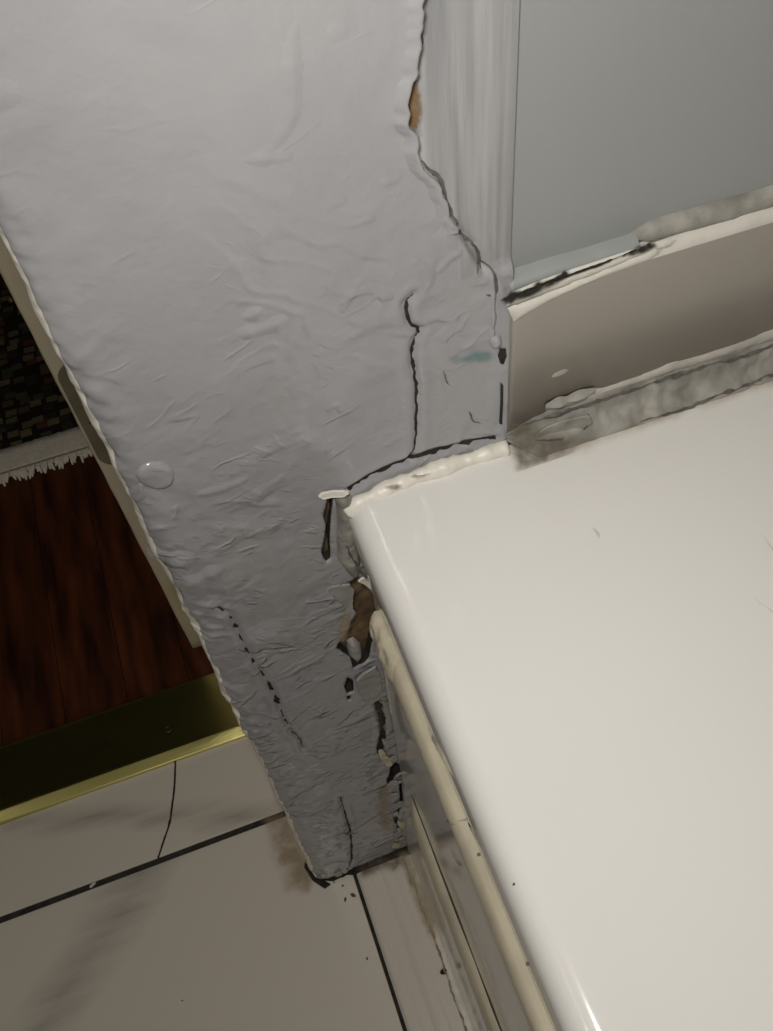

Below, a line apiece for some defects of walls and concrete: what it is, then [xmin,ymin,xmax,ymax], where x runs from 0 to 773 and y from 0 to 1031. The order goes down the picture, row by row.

crack [458,230,498,297]
crack [523,252,629,291]
crack [318,293,773,500]
spalling [327,577,381,705]
peeling [378,749,405,848]